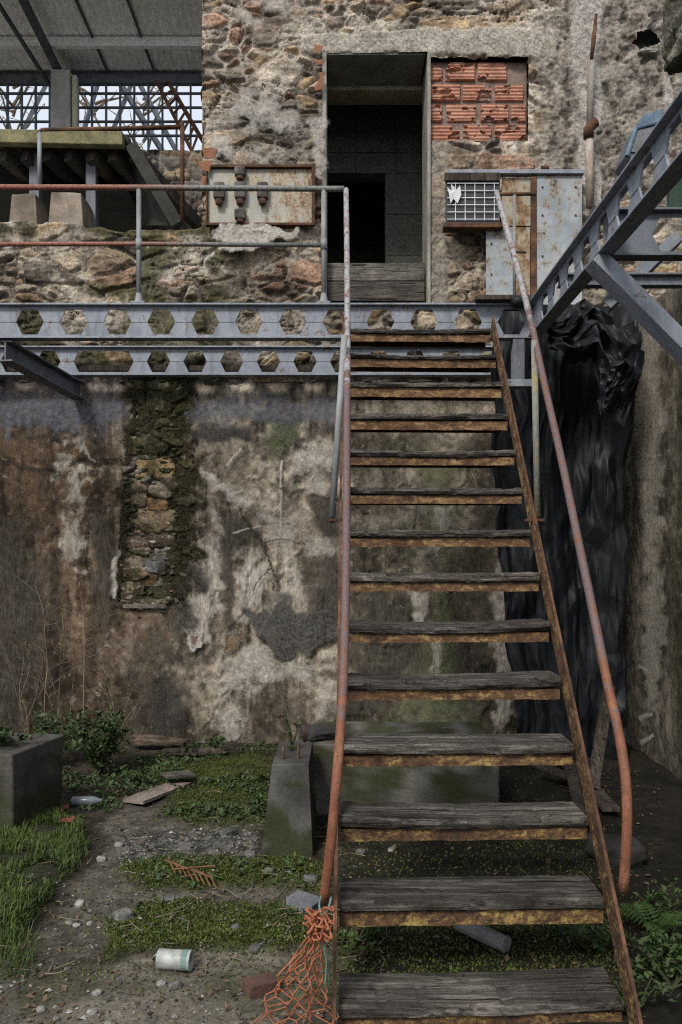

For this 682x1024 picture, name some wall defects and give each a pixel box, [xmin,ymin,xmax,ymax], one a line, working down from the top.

rust [502,178,530,295]
damp [0,395,121,433]
peeling [59,521,86,559]
damp [90,511,116,625]
spalling [111,371,195,617]
damp [0,528,50,733]